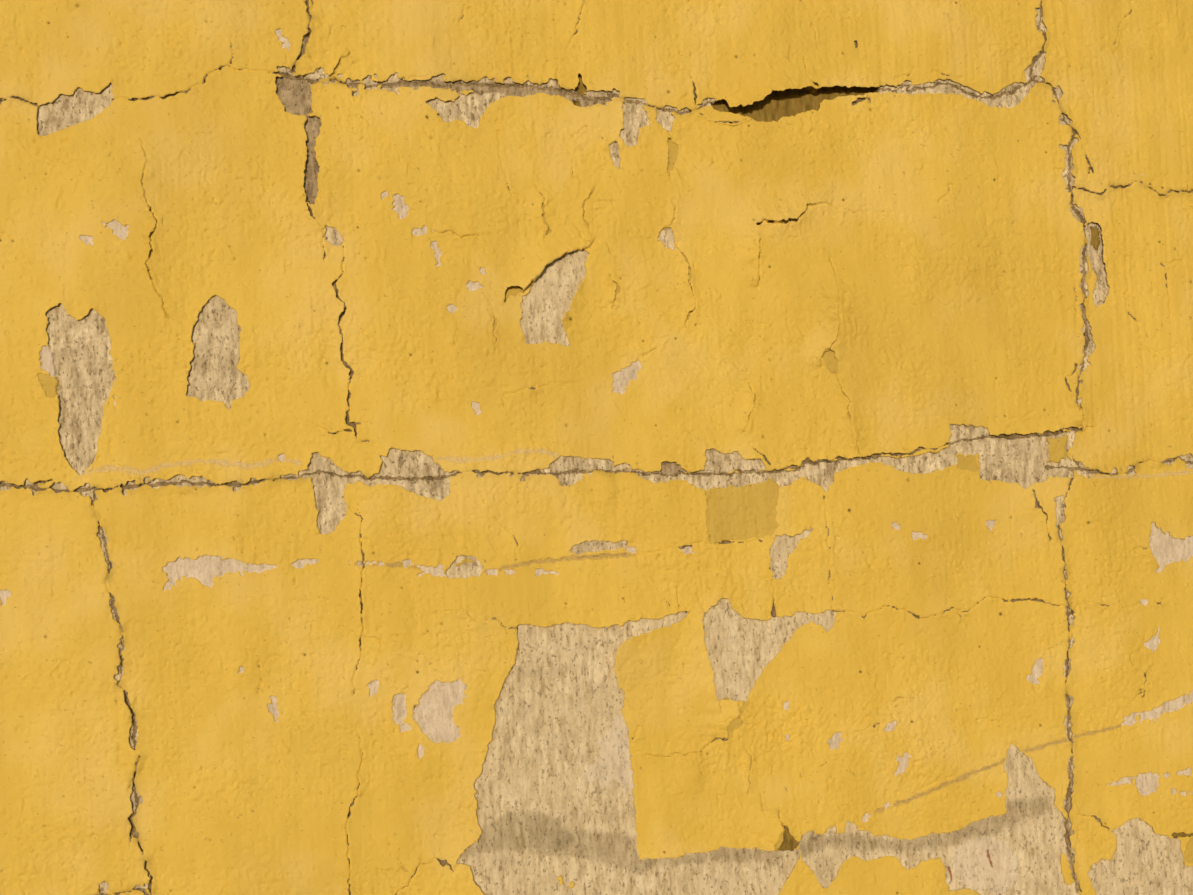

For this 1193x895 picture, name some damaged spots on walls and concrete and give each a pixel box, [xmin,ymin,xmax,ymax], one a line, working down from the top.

crack [0,96,38,110]
crack [112,0,746,124]
crack [852,0,1193,405]
peeling [38,303,117,475]
peeling [186,295,250,410]
crack [307,201,370,442]
peeling [466,223,595,346]
peeling [307,448,450,535]
peeling [660,424,1078,579]
peeling [392,679,468,759]
crack [0,426,1193,895]
peeling [455,596,1193,895]